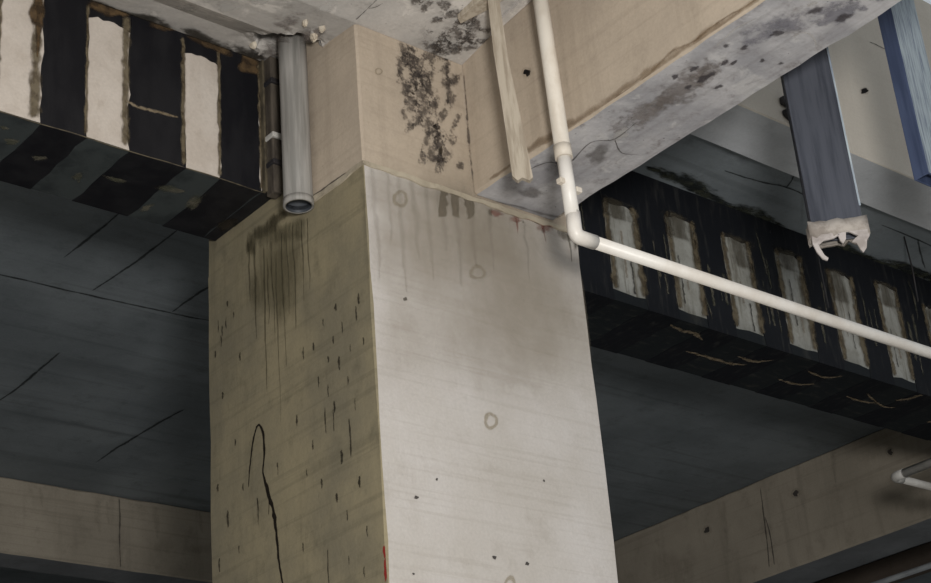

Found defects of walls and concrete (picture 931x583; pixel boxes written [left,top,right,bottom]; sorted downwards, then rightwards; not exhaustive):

damp [397,0,491,172]
damp [248,212,310,324]
crack [0,353,59,400]
crack [98,410,183,461]
crack [248,424,283,583]